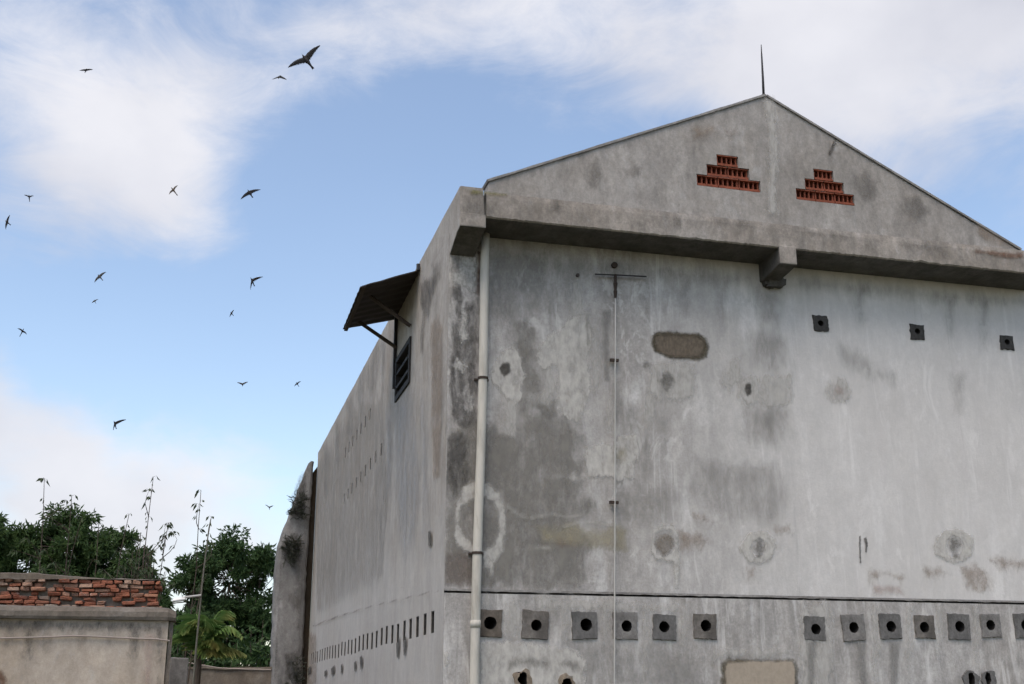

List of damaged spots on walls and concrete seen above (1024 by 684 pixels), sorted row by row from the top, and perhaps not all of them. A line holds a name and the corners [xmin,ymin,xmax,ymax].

damp [446,288,587,589]
peeling [479,602,587,684]